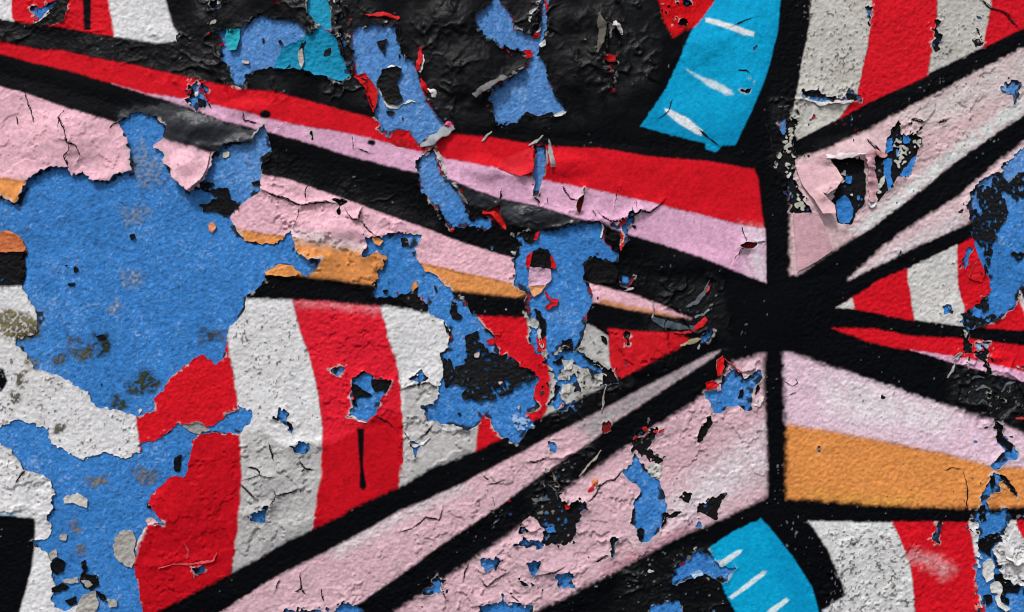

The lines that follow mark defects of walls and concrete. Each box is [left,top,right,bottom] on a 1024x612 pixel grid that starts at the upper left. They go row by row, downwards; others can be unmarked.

crack [16,95,80,166]
peeling [0,112,321,416]
peeling [208,0,642,444]
peeling [771,88,922,272]
peeling [0,405,253,612]
crack [241,443,312,506]
spalling [272,407,310,454]
peeling [490,450,601,591]
peeling [623,417,727,543]
peeling [643,548,736,612]
peeling [697,356,764,443]
peeling [943,148,1024,612]